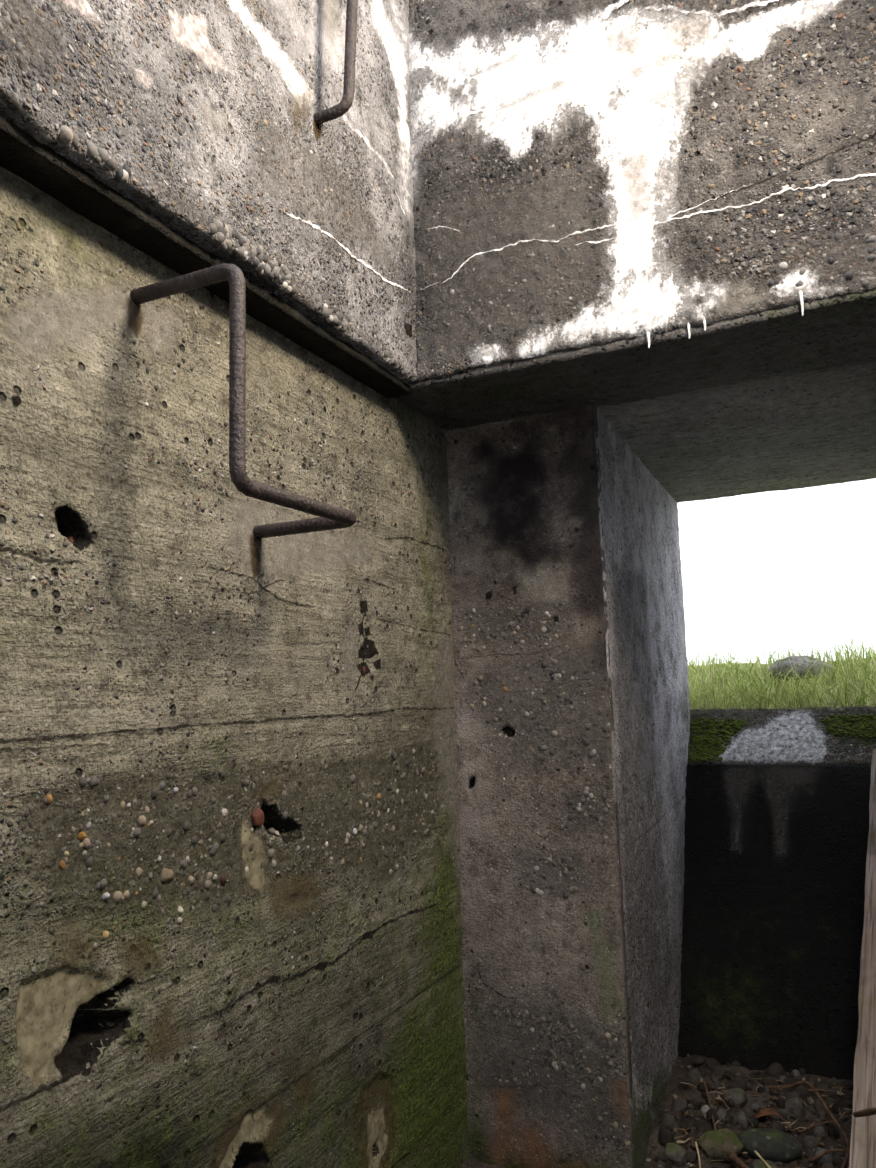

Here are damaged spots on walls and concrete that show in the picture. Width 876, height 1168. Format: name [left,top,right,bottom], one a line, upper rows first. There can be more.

crack [601,0,670,22]
crack [699,0,778,14]
crack [286,117,876,293]
leakage [372,0,836,359]
rust [127,298,142,335]
spalling [54,504,95,550]
rust [250,535,260,576]
spalling [24,748,439,924]
crack [197,903,438,1019]
spalling [16,965,149,1086]
spalling [219,1104,273,1168]
spalling [367,1104,410,1168]